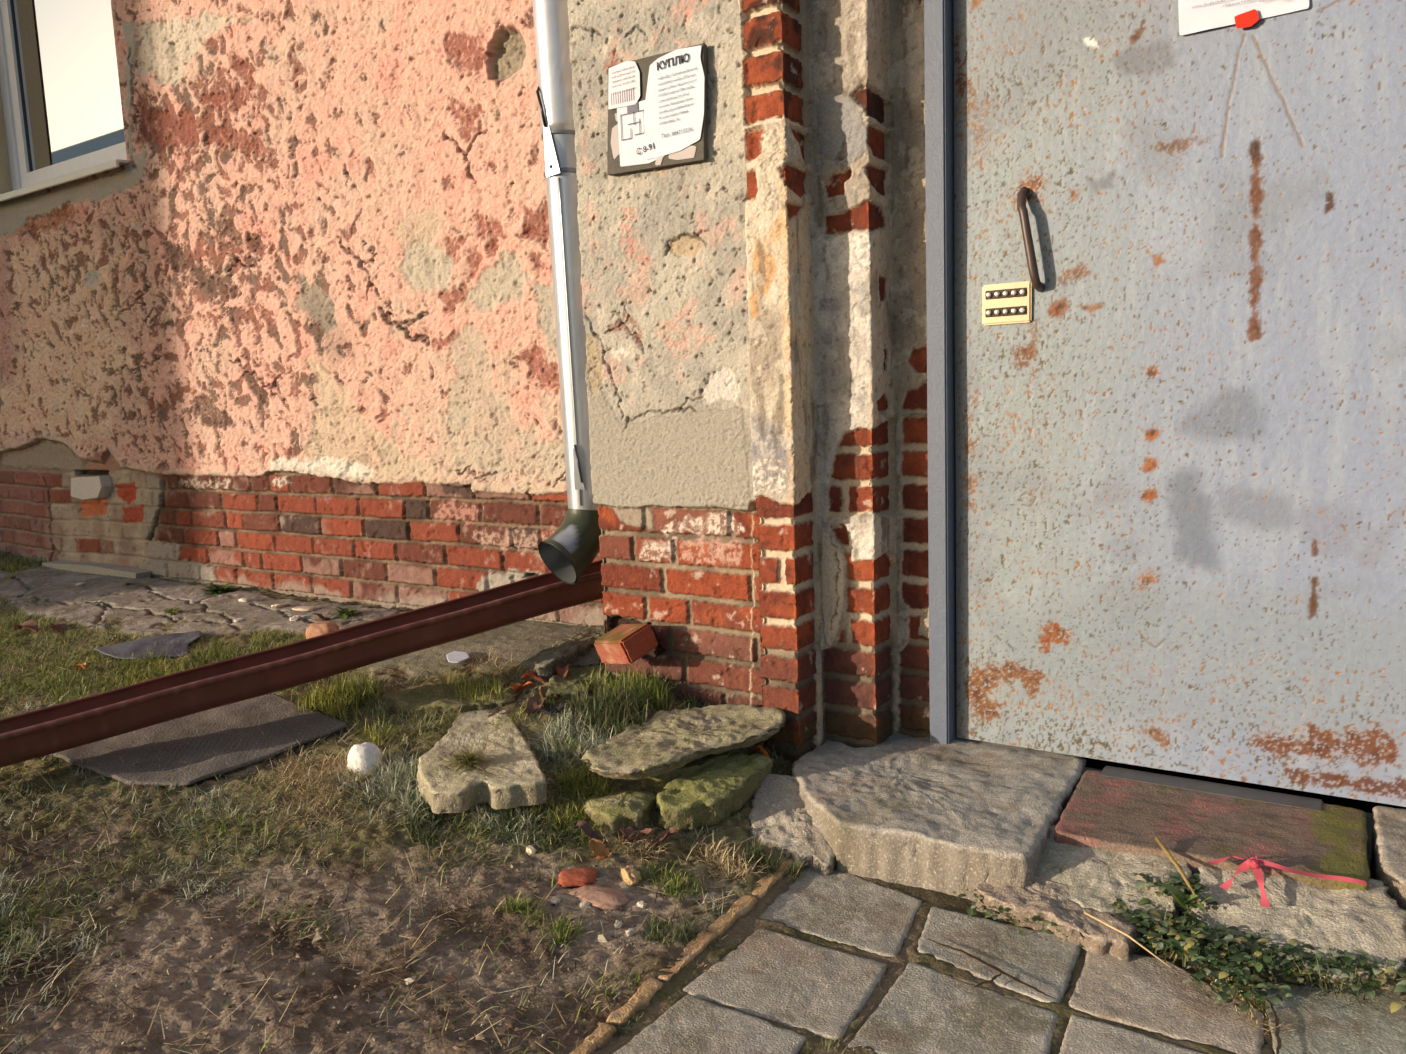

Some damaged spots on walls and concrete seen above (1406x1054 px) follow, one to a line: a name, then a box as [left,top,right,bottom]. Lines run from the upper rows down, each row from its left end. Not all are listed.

spalling [436,23,526,82]
spalling [738,0,893,237]
crack [663,228,710,256]
spalling [879,275,889,303]
corrosion [1245,137,1268,344]
crack [583,301,704,430]
spalling [749,345,930,763]
corrosion [962,618,1075,730]
corrosion [1245,717,1406,805]